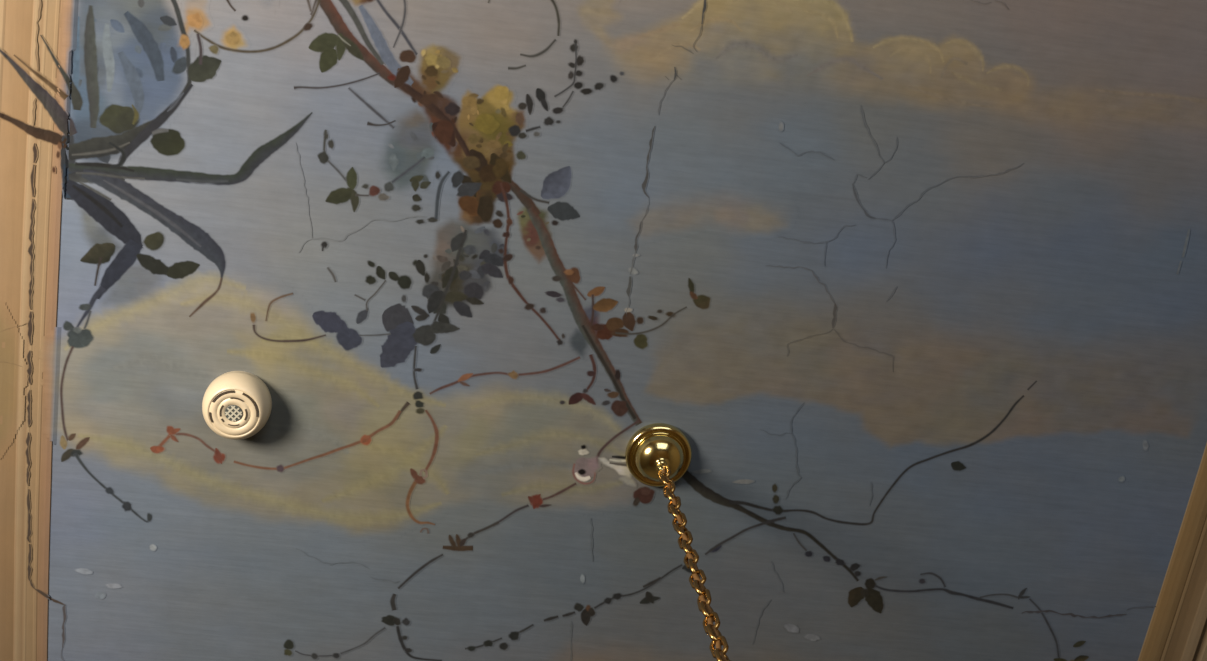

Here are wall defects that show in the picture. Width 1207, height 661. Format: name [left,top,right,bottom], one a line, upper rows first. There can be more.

crack [0,0,67,661]
crack [626,0,707,317]
crack [766,106,1024,369]